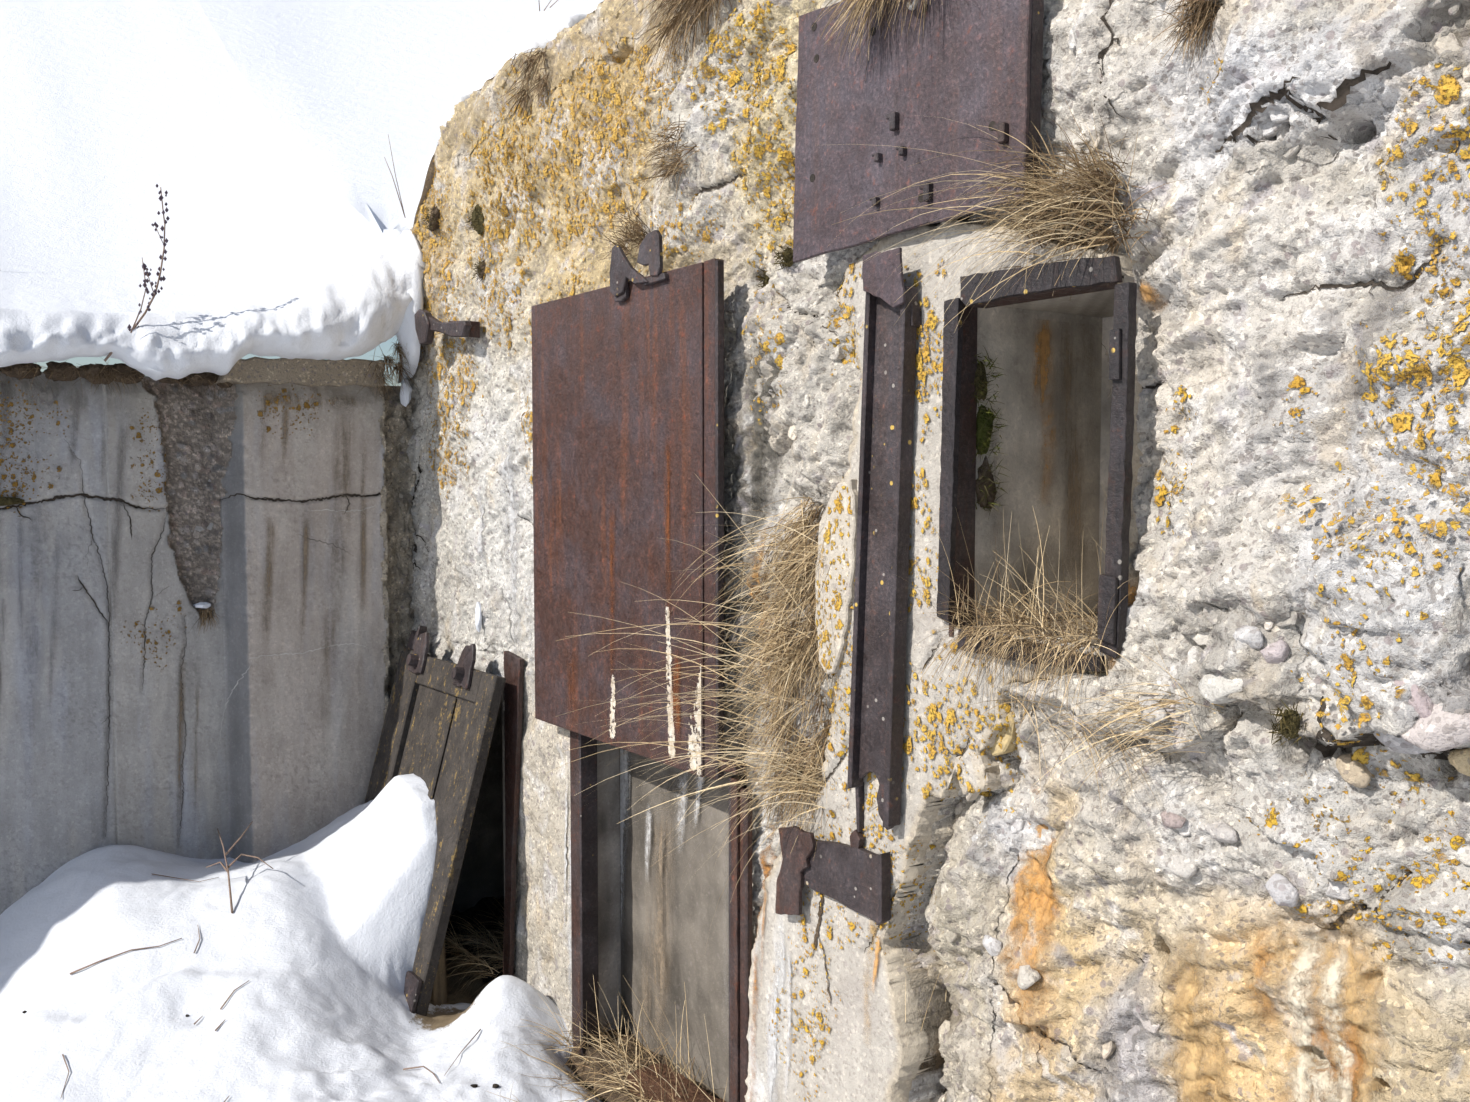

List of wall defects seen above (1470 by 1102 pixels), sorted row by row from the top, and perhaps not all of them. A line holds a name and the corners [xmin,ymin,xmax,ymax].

crack [1215,61,1391,153]
crack [1283,245,1444,298]
spalling [141,377,239,618]
crack [0,439,368,842]
rust [1008,823,1053,1016]
rust [1173,962,1230,1102]
rust [1300,942,1378,1102]